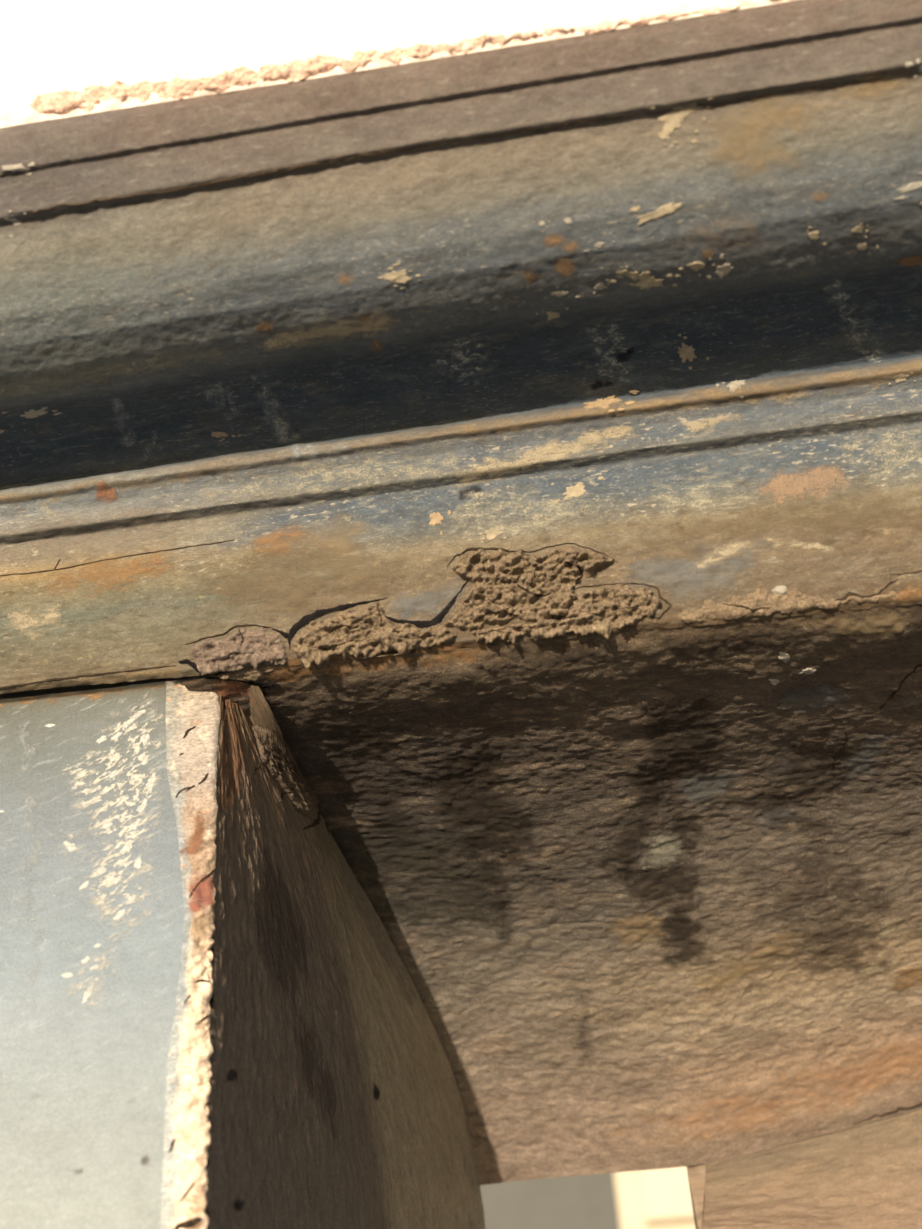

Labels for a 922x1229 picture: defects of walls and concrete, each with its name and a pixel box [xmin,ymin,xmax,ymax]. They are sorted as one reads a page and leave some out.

peeling [650,98,714,148]
peeling [892,173,922,206]
peeling [629,201,683,225]
peeling [377,263,421,289]
peeling [536,254,734,320]
peeling [583,381,639,412]
crack [880,664,922,710]
spalling [61,426,663,1229]
water stain [428,751,531,926]
peeling [641,834,682,869]
water stain [603,699,724,963]
crack [855,1102,922,1124]